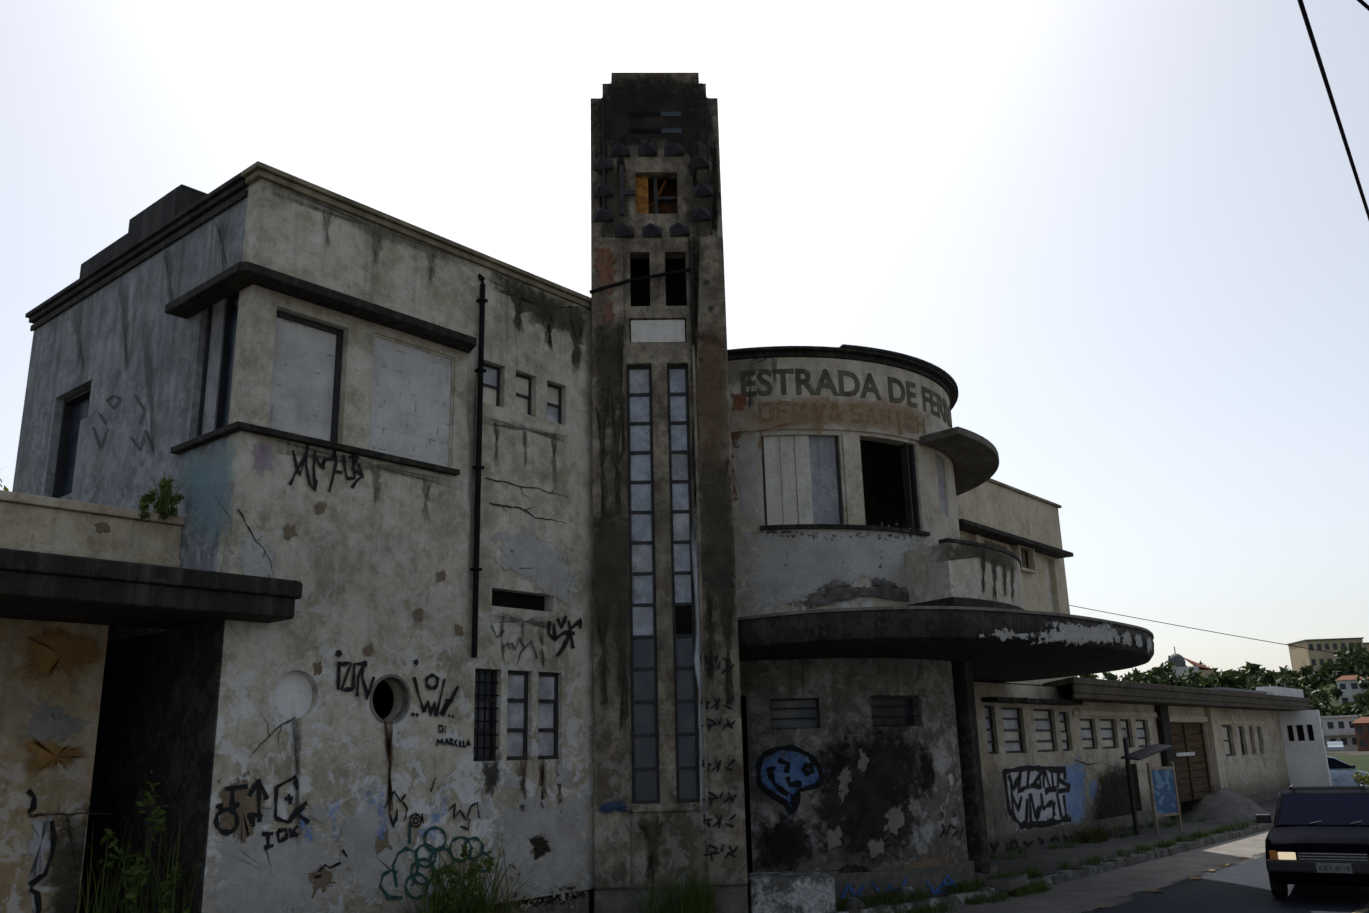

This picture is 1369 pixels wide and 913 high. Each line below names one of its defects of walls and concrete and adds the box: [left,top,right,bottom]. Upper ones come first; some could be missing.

crack [485,477,569,524]
damp [492,273,633,727]
peeling [731,432,936,614]
damp [933,539,1016,601]
peeling [979,621,1152,652]
corrosion [385,721,393,812]
peeling [826,825,842,849]
damp [756,725,935,873]
peeling [838,749,869,804]
peeling [867,794,919,859]